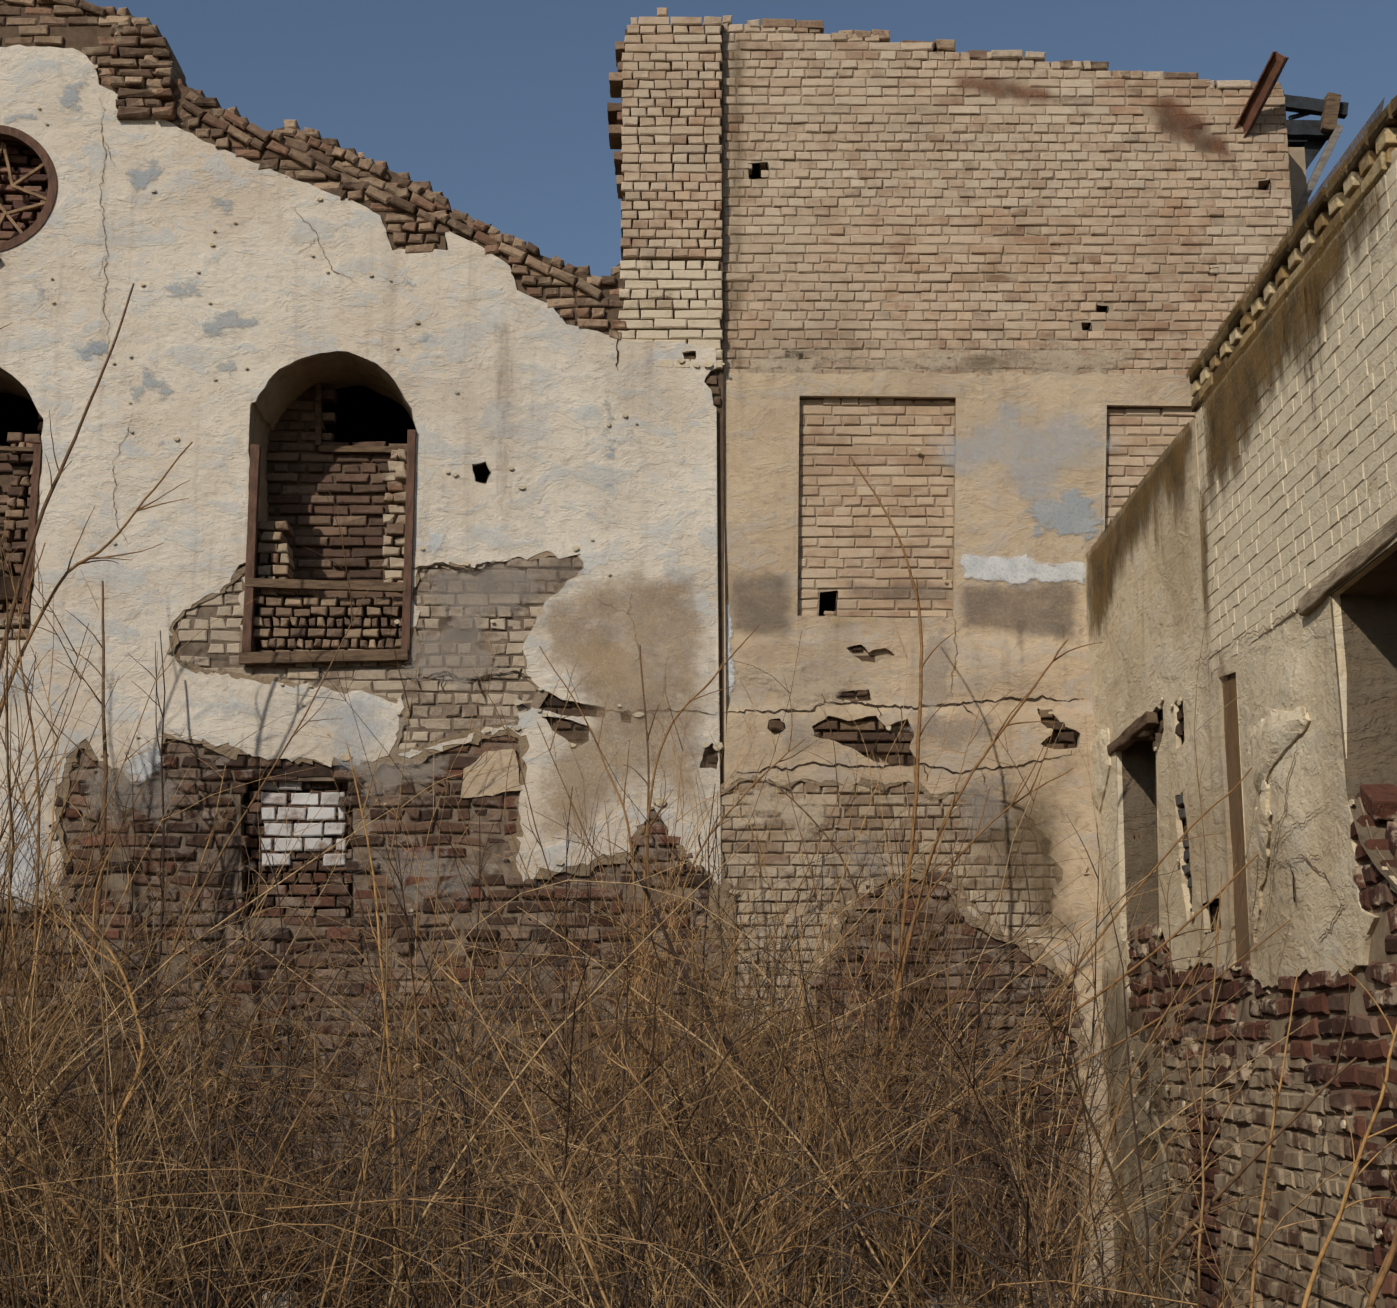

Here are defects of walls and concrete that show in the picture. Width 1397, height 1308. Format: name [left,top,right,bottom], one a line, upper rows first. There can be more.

crack [99,98,115,355]
leakage [1186,97,1385,379]
leakage [966,174,1384,646]
spalling [0,528,1092,1308]
leakage [550,585,697,827]
crack [606,617,1084,893]
spalling [1122,792,1397,1308]
crack [1259,735,1345,965]